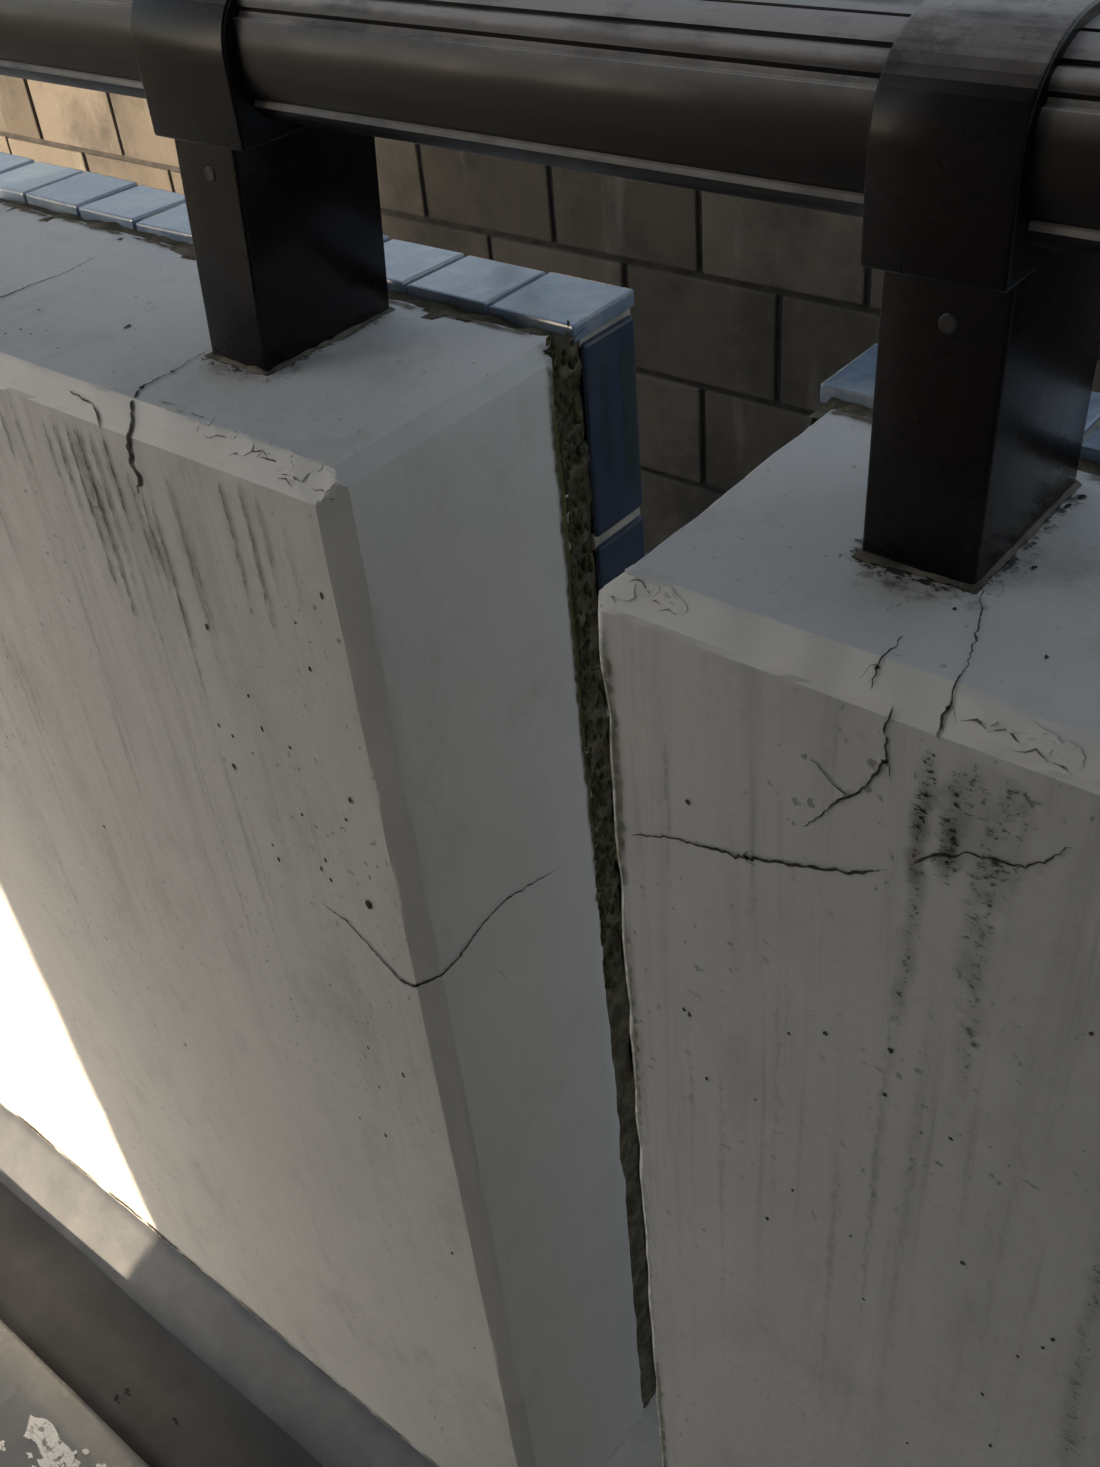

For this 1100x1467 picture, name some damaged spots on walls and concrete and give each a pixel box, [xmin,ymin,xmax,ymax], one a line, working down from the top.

crack [1,257,94,297]
water stain [60,441,124,551]
crack [70,352,205,493]
peeling [159,401,338,500]
crack [937,591,984,737]
crack [805,636,903,826]
crack [633,834,879,875]
water stain [908,754,965,932]
crack [914,847,1069,869]
water stain [983,789,1019,886]
crack [321,868,559,987]